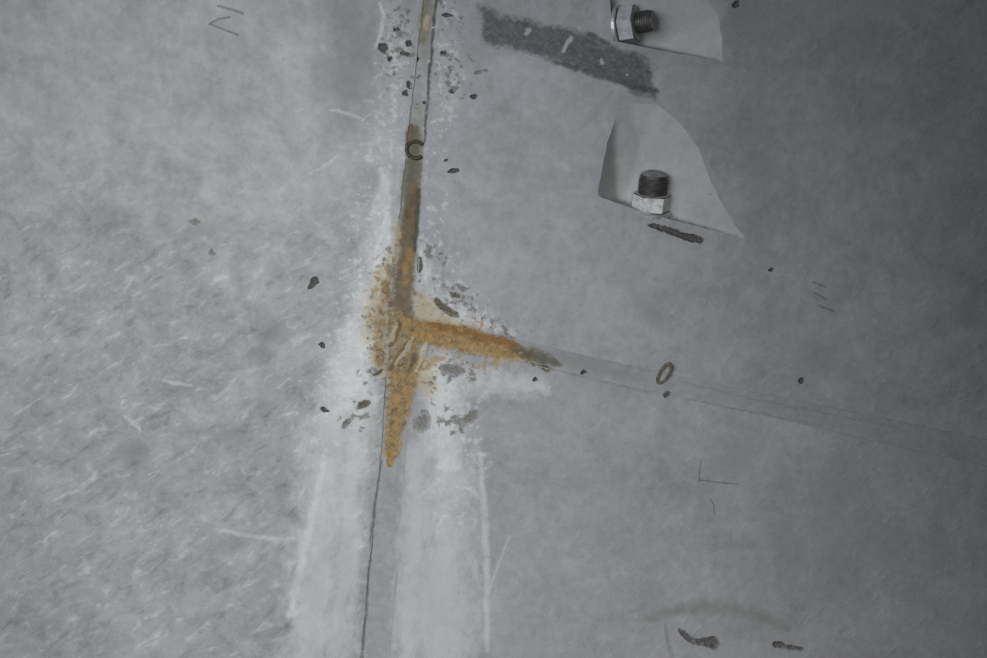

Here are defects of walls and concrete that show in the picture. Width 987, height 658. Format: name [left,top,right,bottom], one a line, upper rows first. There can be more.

leakage [359,126,428,306]
corrosion [362,181,561,467]
leakage [290,318,366,658]
leakage [402,364,543,658]